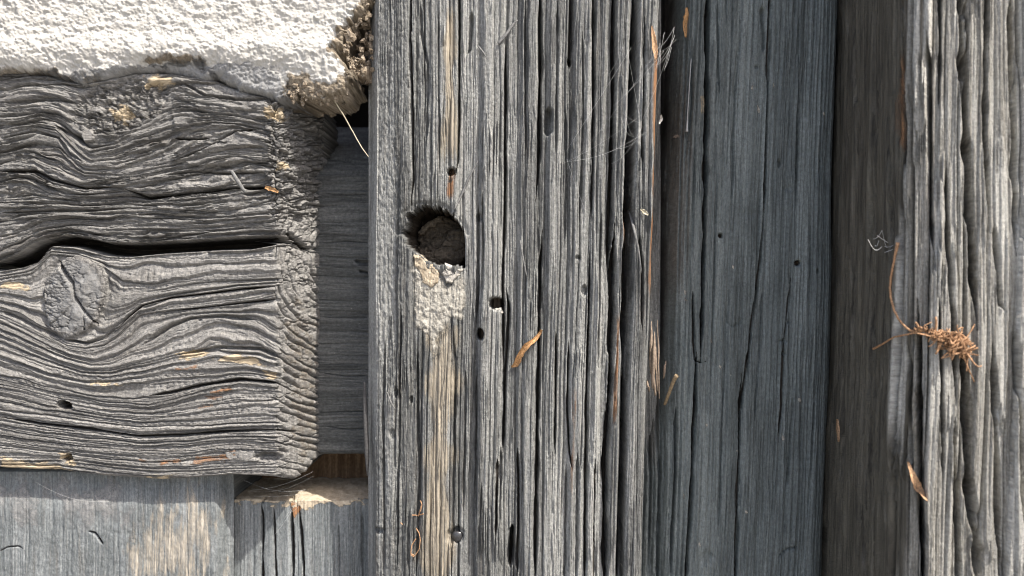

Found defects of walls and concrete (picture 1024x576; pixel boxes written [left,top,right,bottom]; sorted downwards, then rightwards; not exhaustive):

spalling [288,1,375,106]
crack [764,0,772,87]
crack [759,154,767,224]
crack [5,233,310,334]
crack [734,250,760,576]